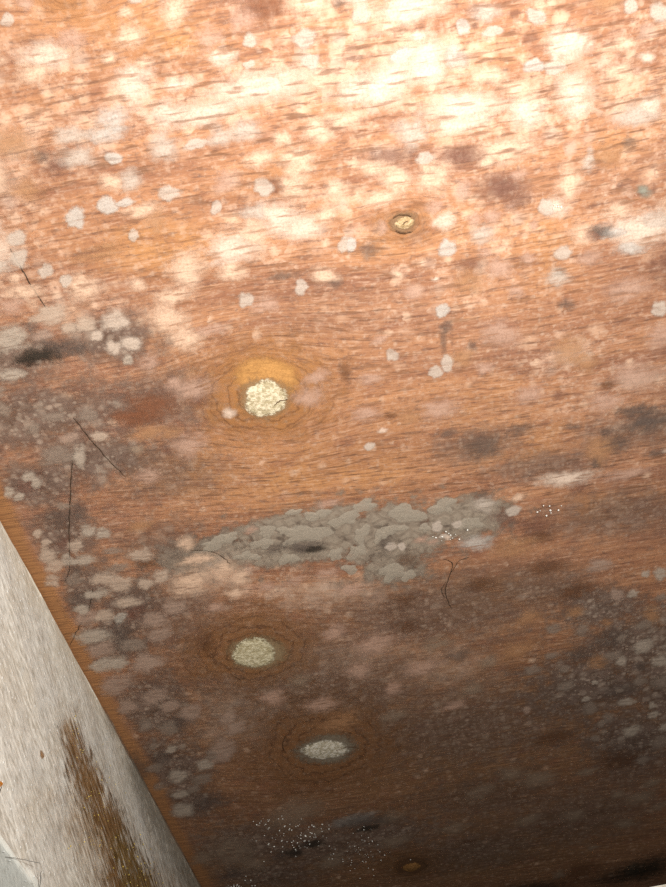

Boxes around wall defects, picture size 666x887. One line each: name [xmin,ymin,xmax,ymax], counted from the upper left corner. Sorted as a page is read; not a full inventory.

water stain [153,60,289,156]
water stain [307,33,458,141]
water stain [525,33,590,75]
water stain [0,231,36,311]
water stain [97,173,160,226]
water stain [211,207,334,280]
water stain [276,133,312,196]
water stain [480,138,531,166]
water stain [539,172,581,215]
water stain [576,205,666,253]
water stain [0,250,522,817]
water stain [526,589,666,764]